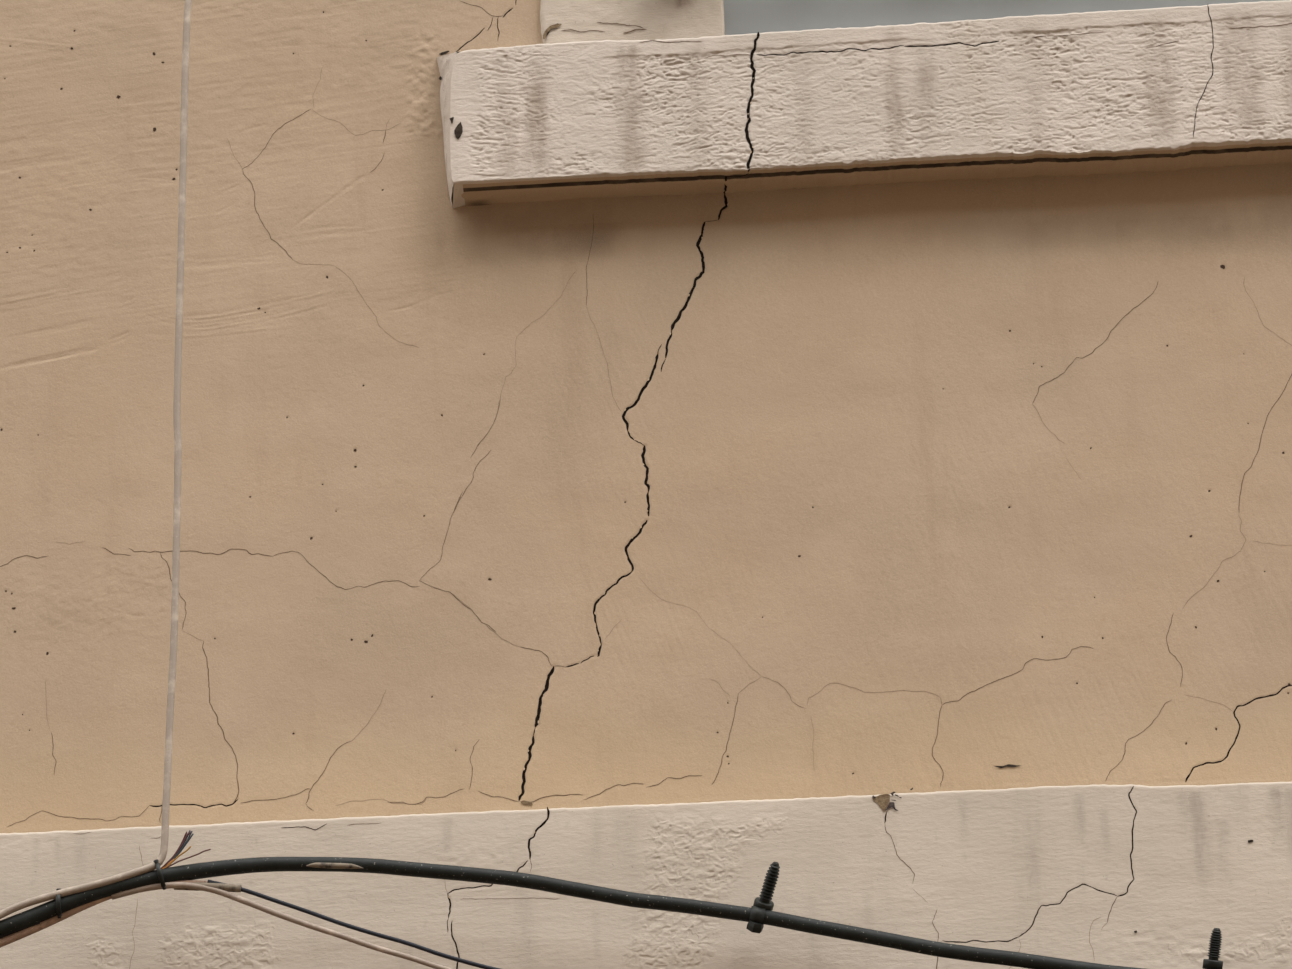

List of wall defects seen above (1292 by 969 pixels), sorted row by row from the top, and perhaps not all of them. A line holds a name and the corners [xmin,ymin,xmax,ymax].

crack [443,1,516,121]
crack [562,22,647,33]
crack [1193,7,1214,138]
crack [0,32,1094,872]
crack [885,277,1292,969]
spalling [872,788,913,812]
crack [445,884,559,969]